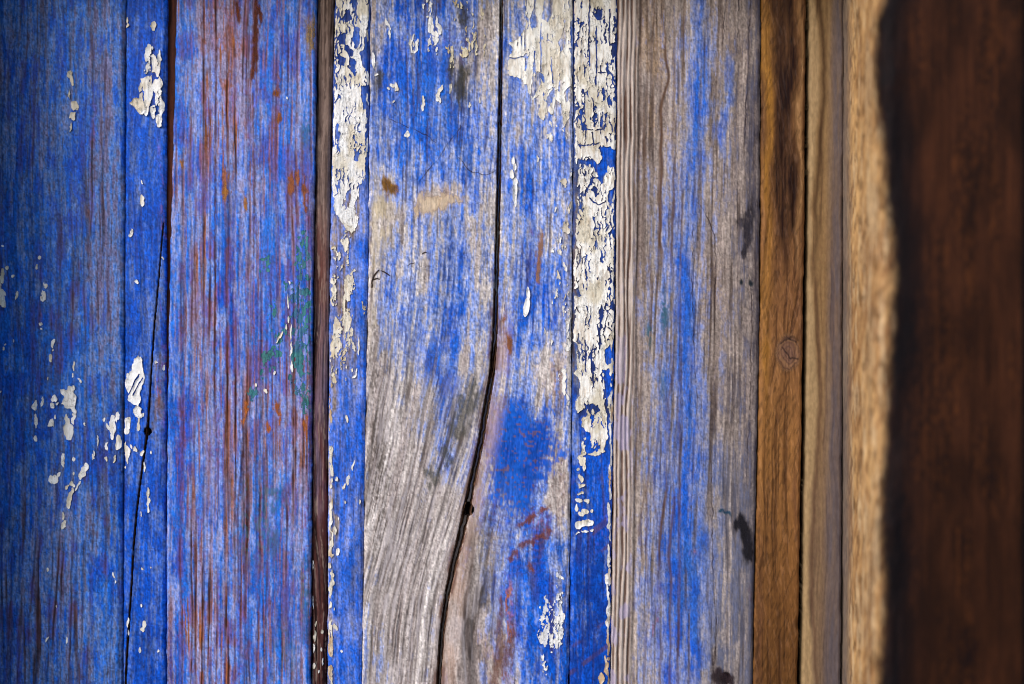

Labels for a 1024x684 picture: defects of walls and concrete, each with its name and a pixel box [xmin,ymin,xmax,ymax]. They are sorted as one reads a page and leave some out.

peeling [130,44,165,128]
peeling [329,0,378,431]
peeling [421,84,452,111]
peeling [31,362,85,442]
peeling [48,356,165,529]
crack [125,223,164,684]
peeling [313,446,355,684]
crack [436,0,504,684]
peeling [508,0,617,684]